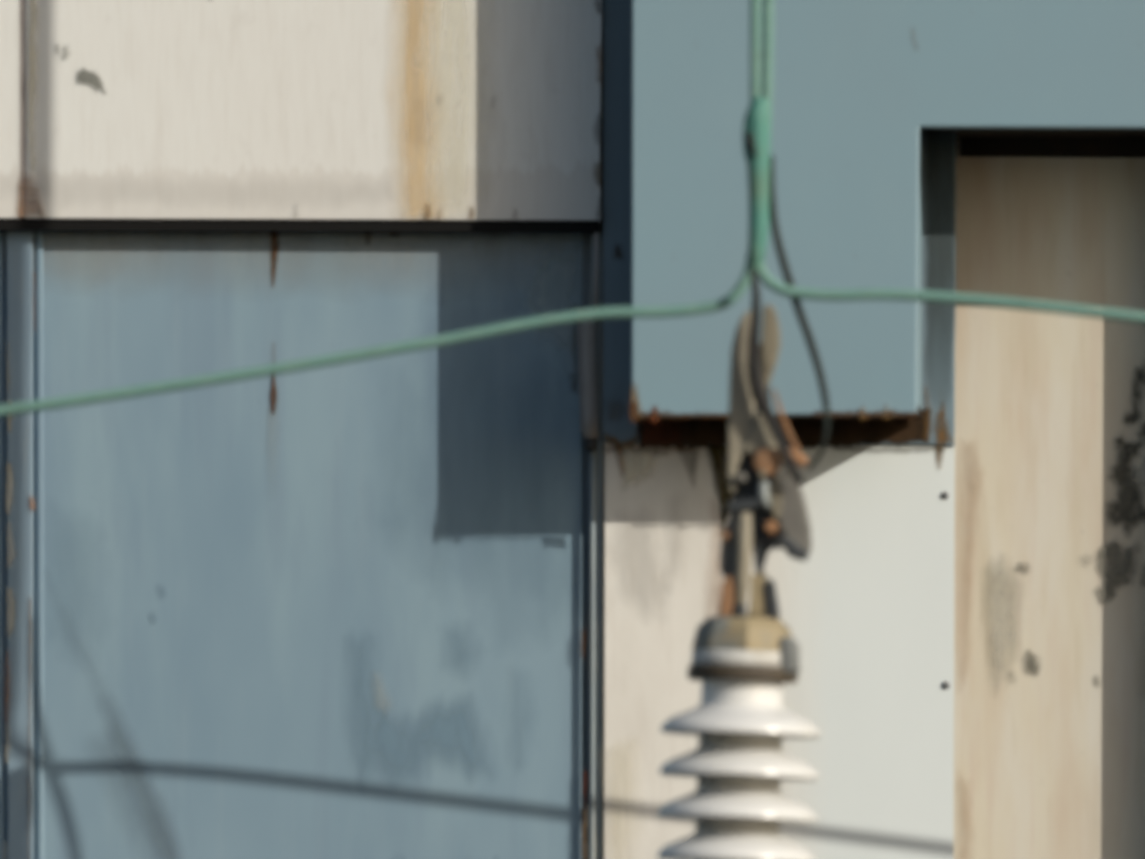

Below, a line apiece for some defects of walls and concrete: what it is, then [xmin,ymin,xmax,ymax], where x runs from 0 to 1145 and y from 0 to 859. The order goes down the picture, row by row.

peeling [78,69,105,92]
corrosion [605,392,729,479]
corrosion [776,409,949,463]